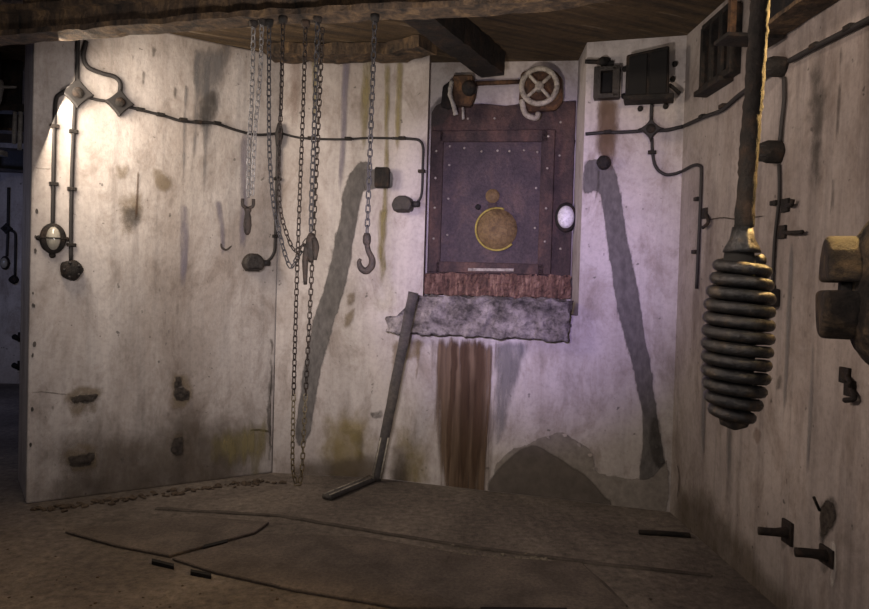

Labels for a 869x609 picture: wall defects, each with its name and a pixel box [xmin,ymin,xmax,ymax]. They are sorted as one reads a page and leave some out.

water stain [174,52,224,173]
water stain [125,174,139,224]
peeling [488,160,669,511]
spalling [68,388,99,412]
spalling [174,377,190,406]
corrosion [436,339,492,490]
spalling [67,447,95,470]